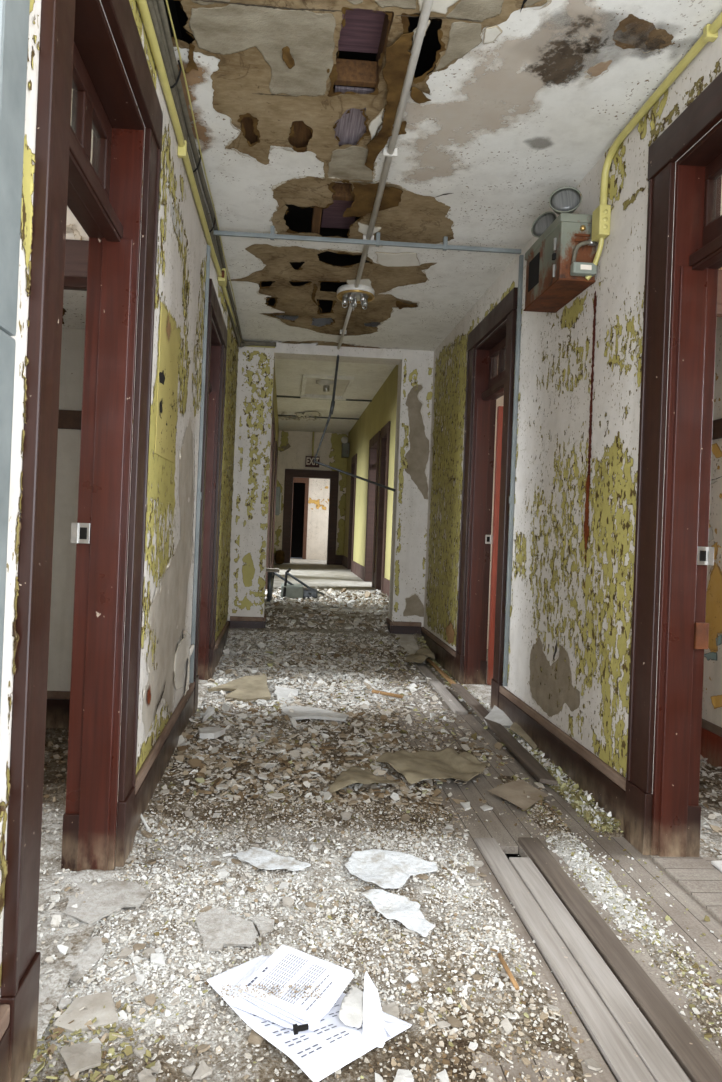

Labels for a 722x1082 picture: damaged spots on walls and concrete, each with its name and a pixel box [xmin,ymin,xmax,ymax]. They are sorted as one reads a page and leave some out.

peeling [27,0,40,91]
peeling [129,0,157,89]
peeling [177,61,211,152]
damp [529,14,665,86]
peeling [20,134,36,297]
flaking render [136,124,207,774]
peeling [215,287,291,641]
peeling [394,281,515,646]
peeling [505,278,645,778]
peeling [704,520,722,663]